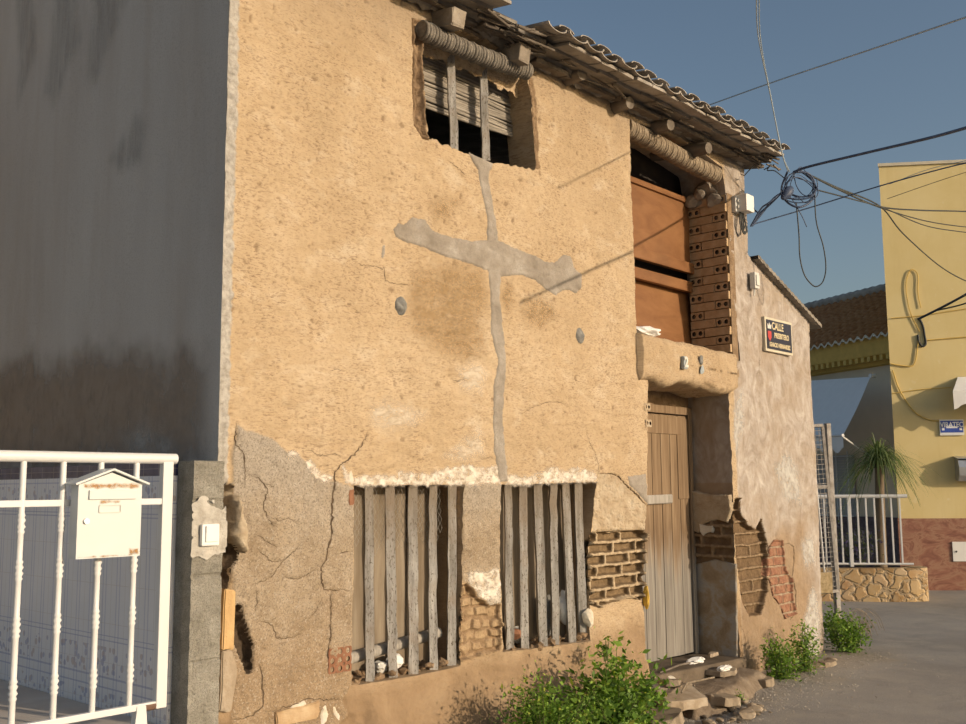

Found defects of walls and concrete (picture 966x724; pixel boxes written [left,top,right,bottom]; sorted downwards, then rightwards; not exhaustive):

damp [0,353,198,467]
peeling [289,451,332,482]
spalling [221,482,249,589]
spalling [234,603,253,674]
crack [234,660,344,720]
crack [234,426,366,647]
spalling [457,568,505,662]
spalling [342,464,650,608]
peeling [688,490,798,657]